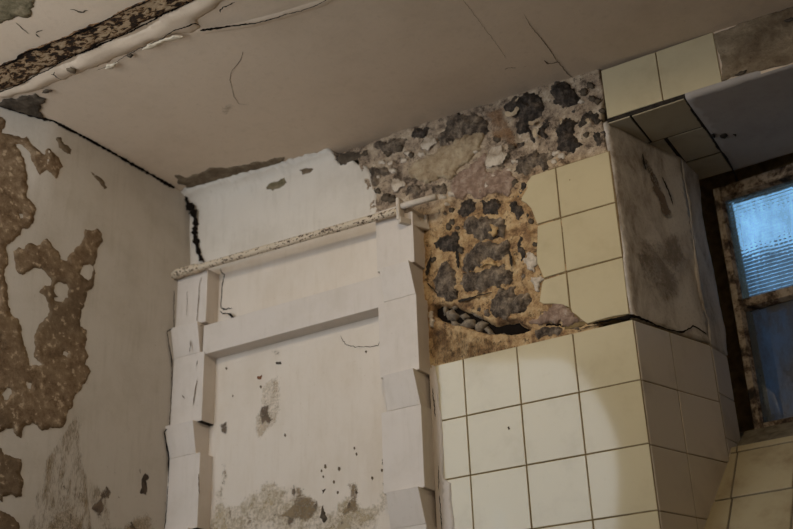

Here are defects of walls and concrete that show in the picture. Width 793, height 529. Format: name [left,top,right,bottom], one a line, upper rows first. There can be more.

peeling [174,157,285,188]
peeling [266,178,286,191]
damp [642,154,673,216]
peeling [0,0,235,438]
spalling [334,69,608,368]
crack [0,106,234,528]
crack [581,314,706,334]
peeling [0,448,24,529]
damp [36,421,111,529]
damp [140,472,149,495]
damp [236,489,317,528]
damp [329,484,373,529]